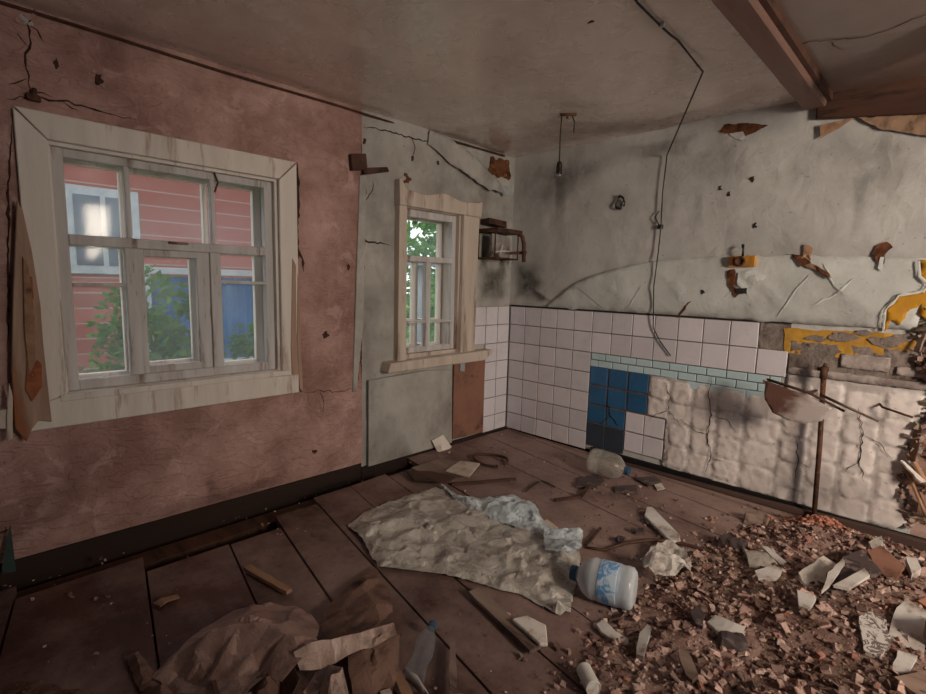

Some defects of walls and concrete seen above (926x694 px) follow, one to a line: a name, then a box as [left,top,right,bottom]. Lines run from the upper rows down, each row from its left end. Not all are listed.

crack [7,9,135,120]
crack [4,125,12,347]
peeling [791,254,832,278]
spalling [614,476,661,494]
crack [654,377,736,476]
peeling [647,320,926,530]
crack [843,409,890,481]